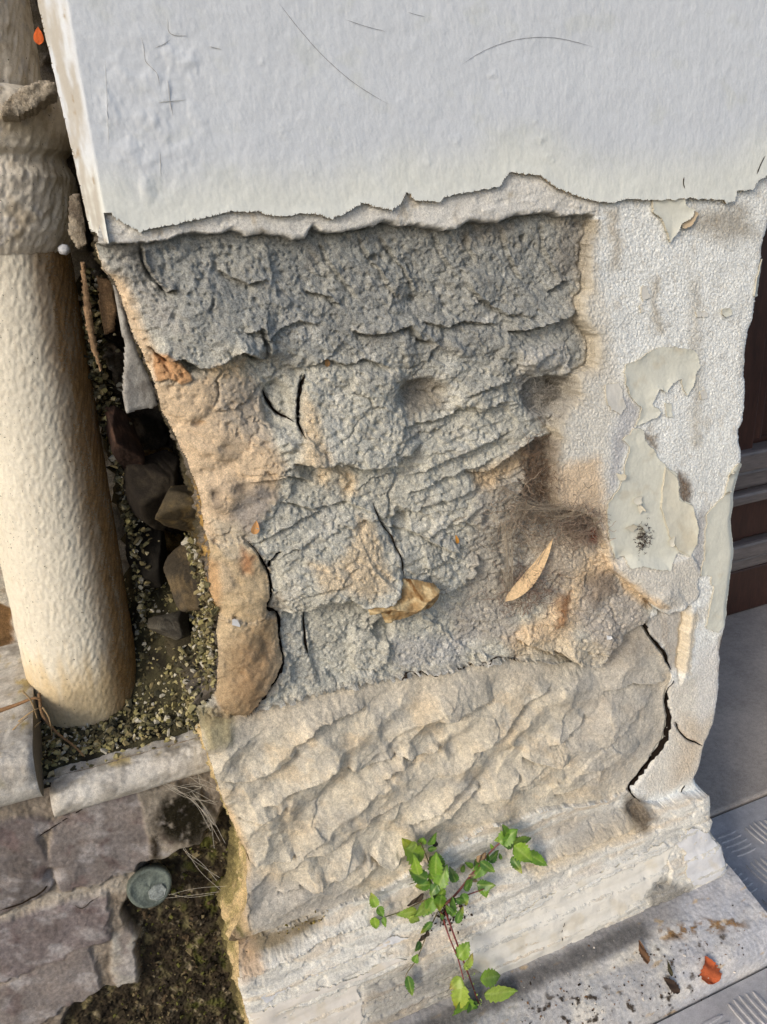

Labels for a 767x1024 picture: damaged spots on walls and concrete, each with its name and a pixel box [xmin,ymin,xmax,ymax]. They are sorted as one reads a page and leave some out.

peeling [651,198,699,242]
crack [263,374,307,440]
spalling [96,212,742,719]
crack [247,541,309,711]
crack [627,622,703,800]